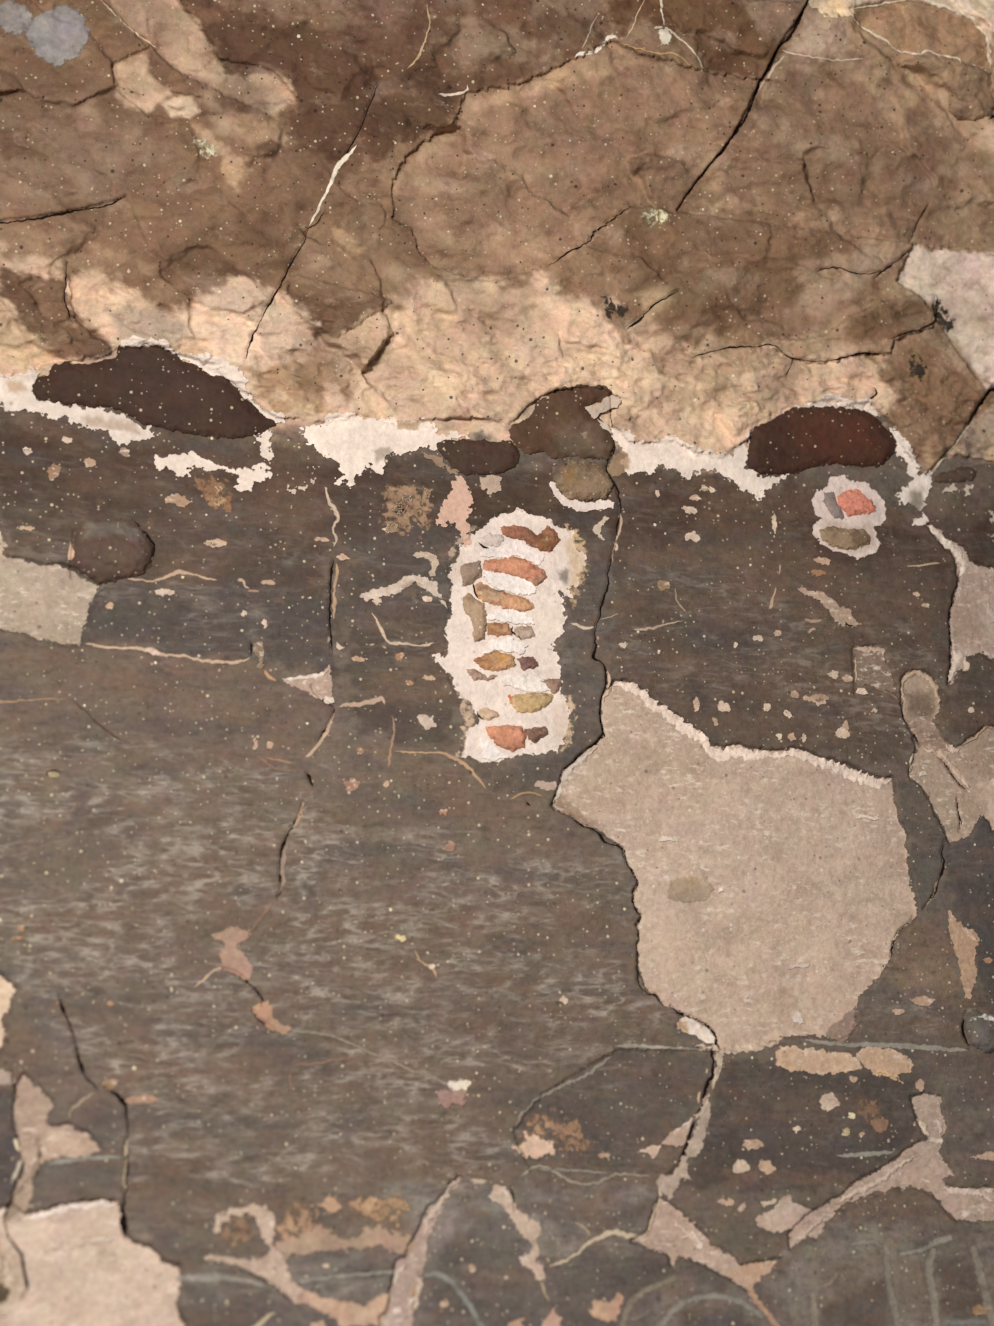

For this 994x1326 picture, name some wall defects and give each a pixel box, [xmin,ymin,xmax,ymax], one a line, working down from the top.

crack [0,196,125,224]
crack [246,85,378,357]
crack [677,0,808,210]
crack [692,296,935,375]
spalling [0,531,114,645]
flaking render [360,551,447,608]
spalling [460,525,562,752]
spalling [827,525,994,843]
crack [0,1140,41,1318]
crack [19,988,129,1238]
spalling [0,1069,186,1326]
spalling [194,681,994,1326]